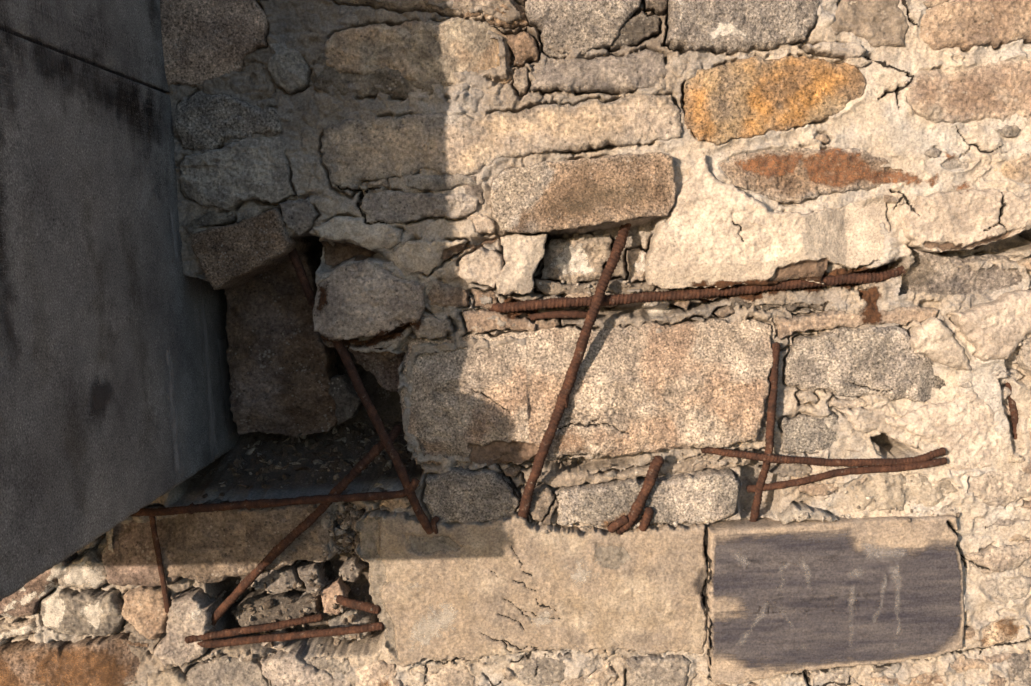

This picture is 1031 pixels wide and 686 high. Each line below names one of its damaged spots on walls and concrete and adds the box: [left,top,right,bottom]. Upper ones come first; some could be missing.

leakage [35,16,167,144]
spalling [321,241,377,268]
rust [320,318,421,349]
rust [504,297,539,321]
rust [692,261,898,324]
leakage [199,281,233,452]
leakage [90,381,113,419]
spalling [130,340,460,659]
crack [424,545,566,686]
crack [791,638,1031,686]